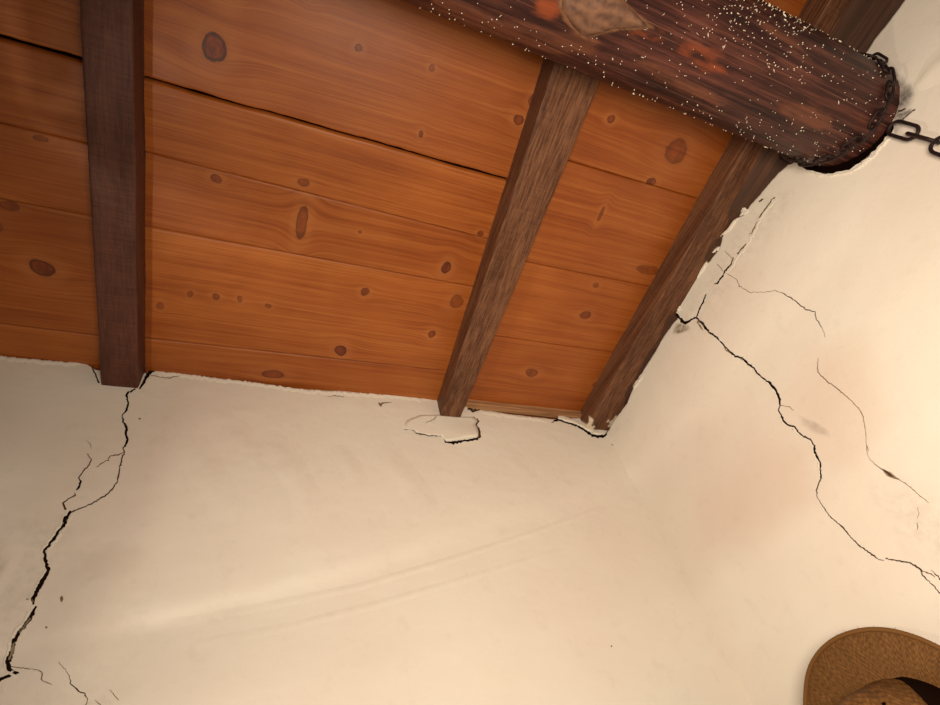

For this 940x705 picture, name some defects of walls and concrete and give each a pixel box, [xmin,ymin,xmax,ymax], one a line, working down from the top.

crack [0,370,178,705]
peeling [404,408,481,445]
peeling [697,207,749,278]
crack [675,197,940,594]